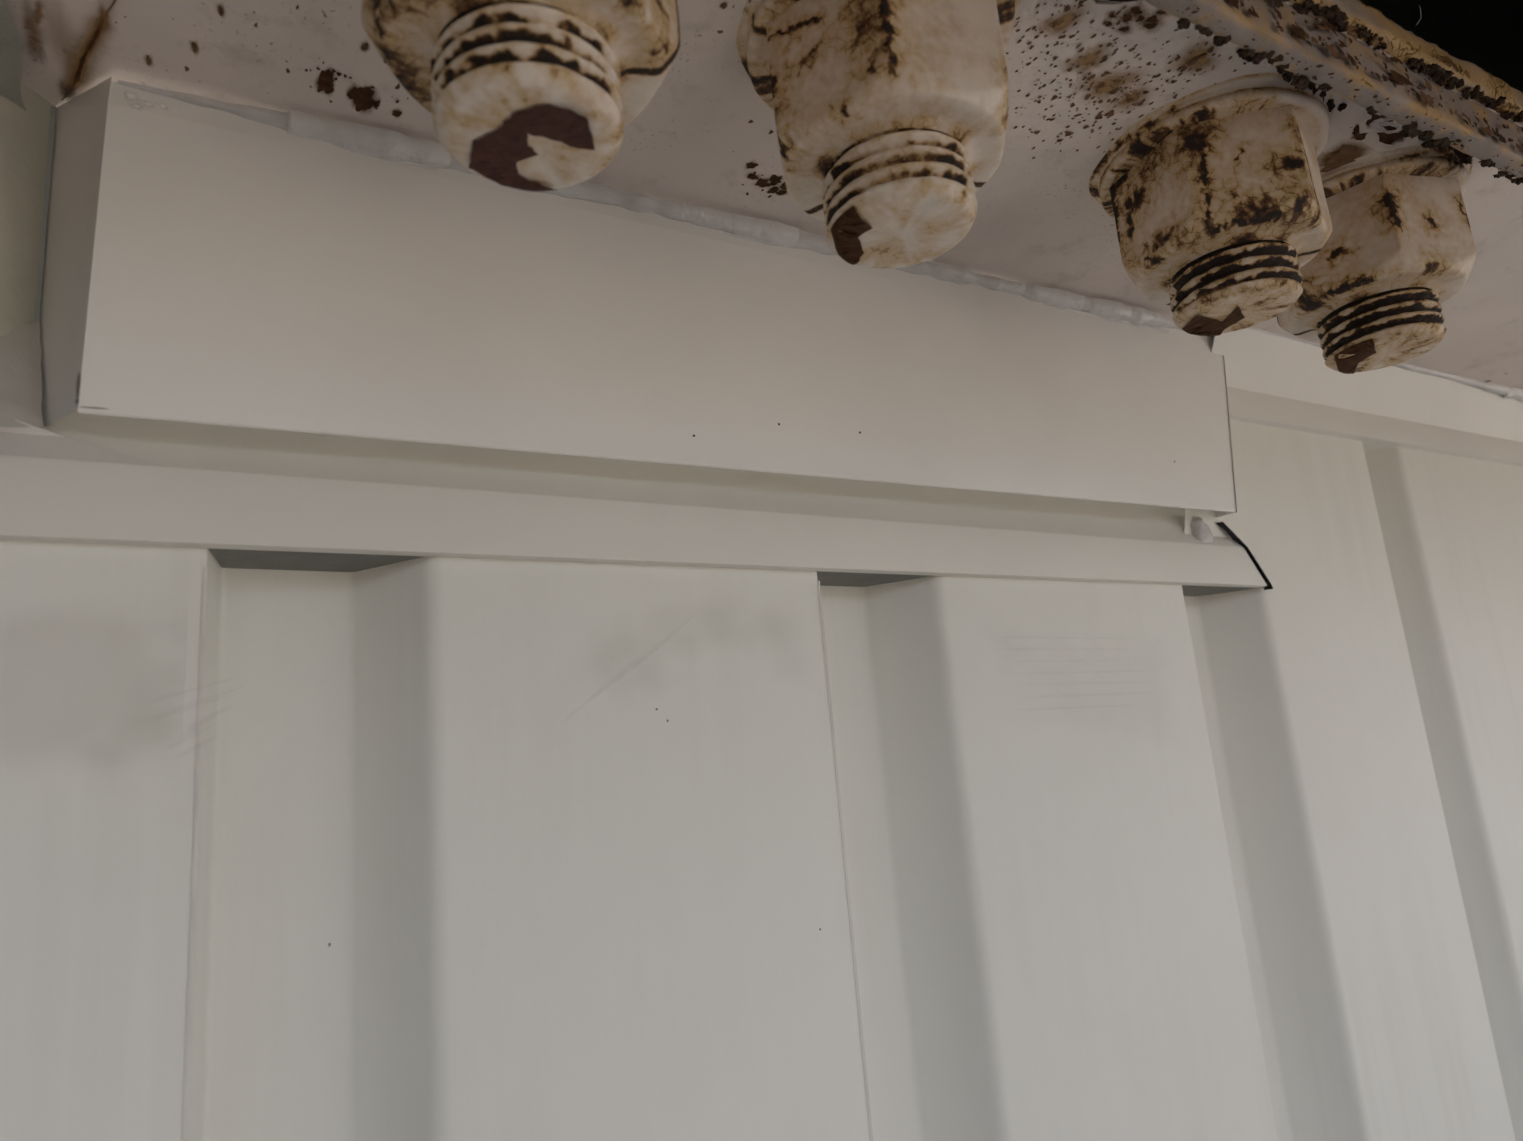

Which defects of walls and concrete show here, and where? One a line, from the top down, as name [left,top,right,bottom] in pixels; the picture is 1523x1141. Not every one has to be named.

rust [733,151,788,198]
rust [1006,0,1523,185]